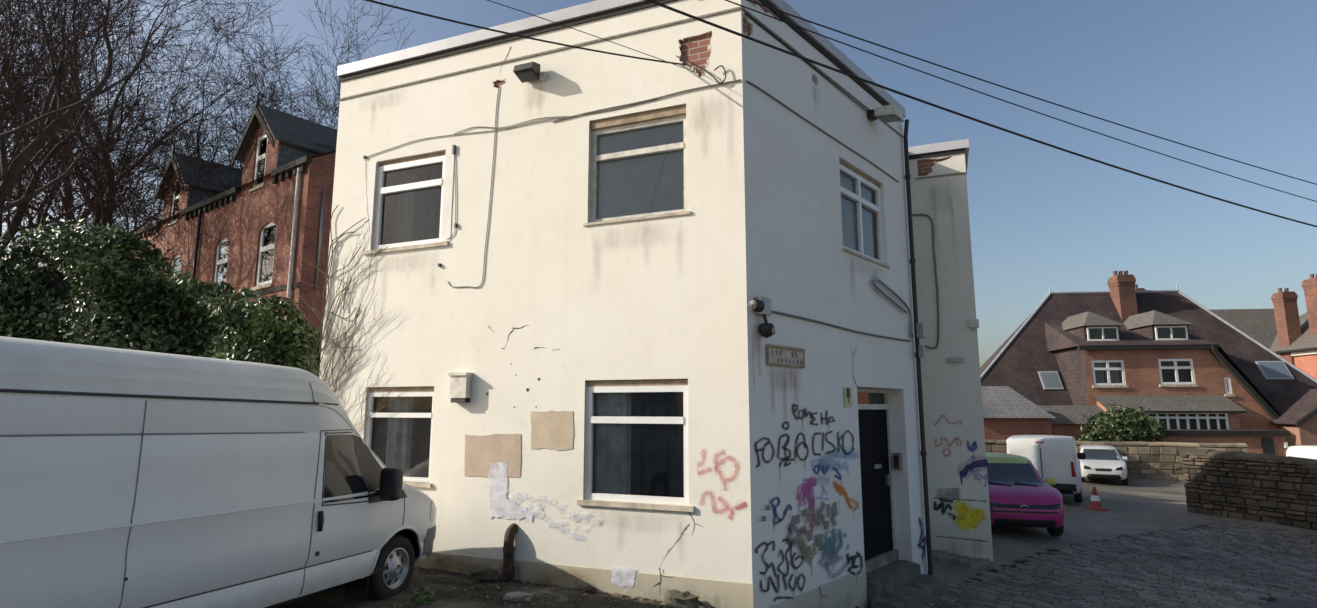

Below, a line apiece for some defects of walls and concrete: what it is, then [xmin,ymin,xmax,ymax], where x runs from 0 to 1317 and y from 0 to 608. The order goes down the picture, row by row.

spalling [678,33,712,77]
spalling [917,156,952,176]
crack [488,325,558,350]
crack [653,512,703,591]